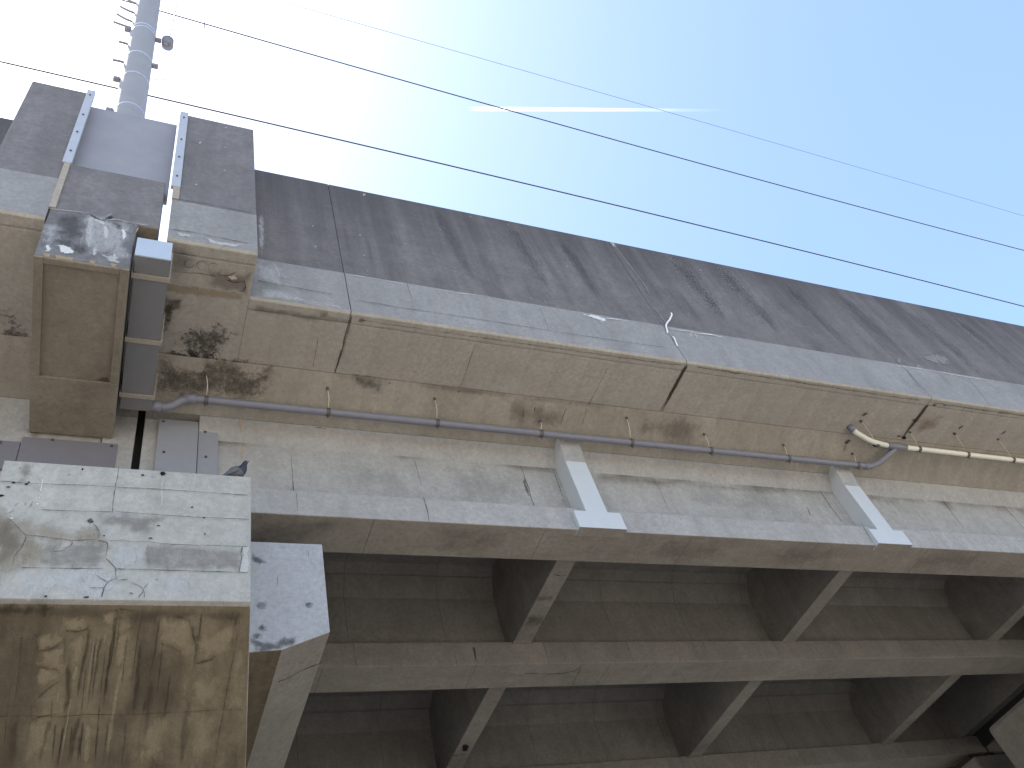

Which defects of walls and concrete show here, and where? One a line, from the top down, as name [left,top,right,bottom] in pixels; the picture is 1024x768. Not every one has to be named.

leakage [158,327,266,395]
crack [9,467,221,611]
leakage [27,613,167,760]
leakage [161,619,233,654]